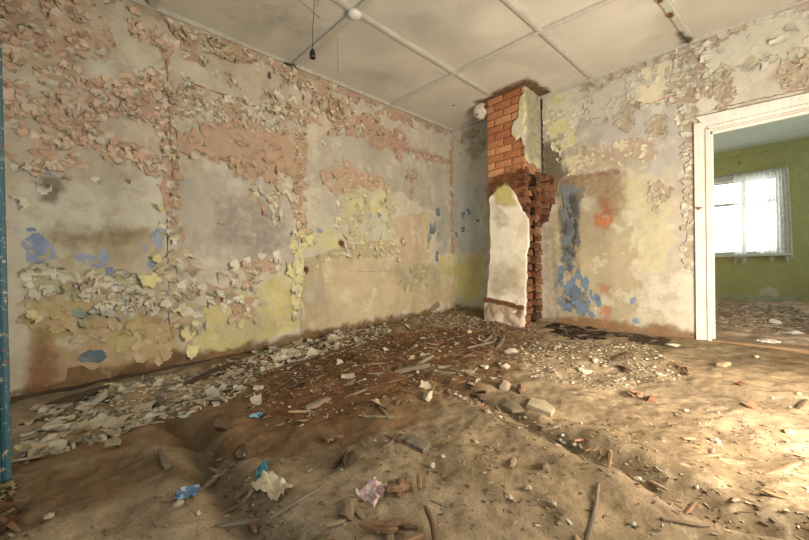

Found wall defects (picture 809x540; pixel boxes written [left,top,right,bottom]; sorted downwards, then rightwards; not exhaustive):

peeling [0,0,556,367]
peeling [543,8,809,274]
flaking render [51,365,112,390]